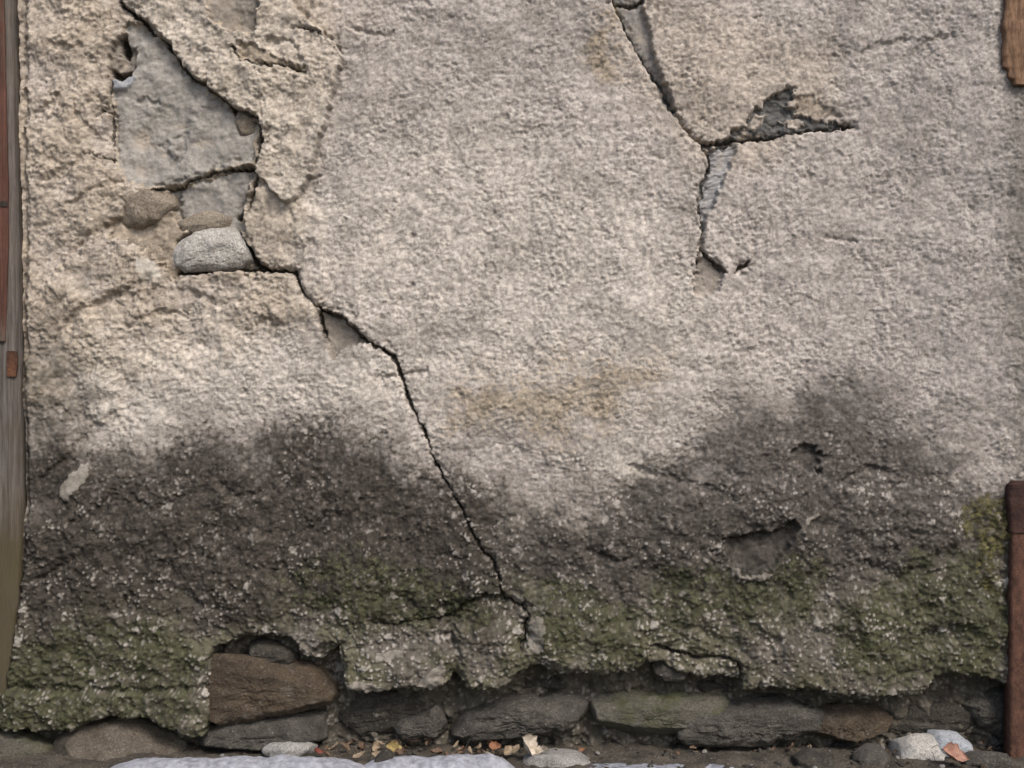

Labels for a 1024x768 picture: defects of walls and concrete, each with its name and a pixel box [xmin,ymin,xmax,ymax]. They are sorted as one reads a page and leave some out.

spalling [108,23,297,282]
crack [121,0,463,512]
crack [612,0,854,291]
spalling [698,88,849,230]
crack [377,541,529,652]
leakage [11,368,1010,661]
spalling [722,513,820,583]